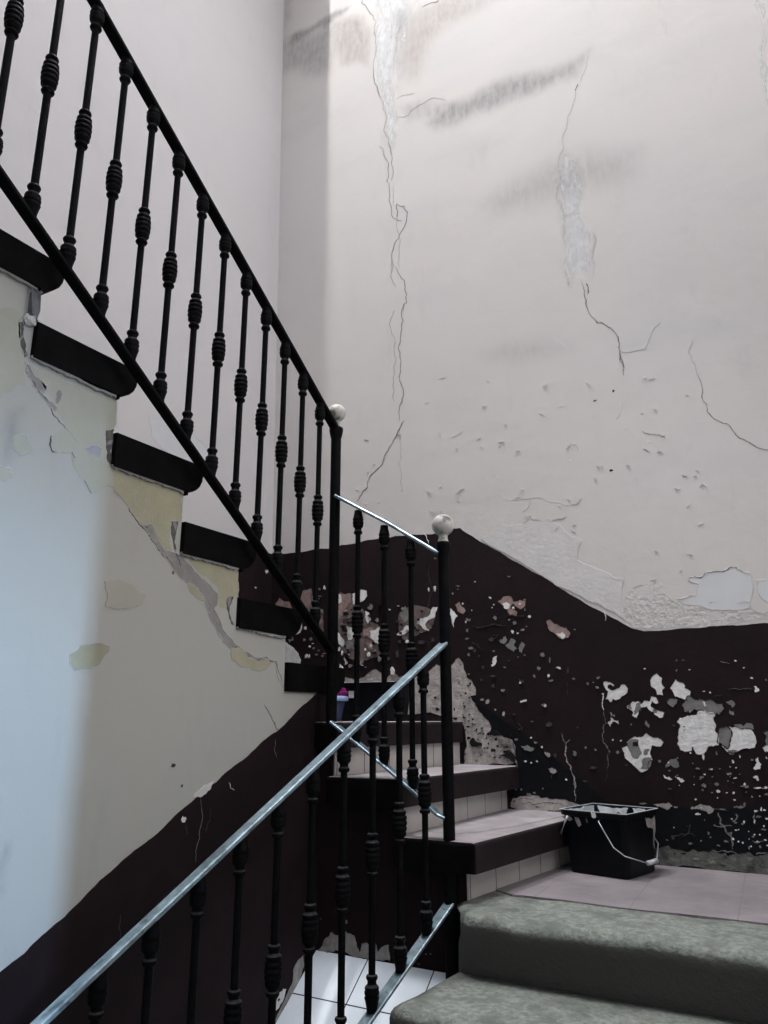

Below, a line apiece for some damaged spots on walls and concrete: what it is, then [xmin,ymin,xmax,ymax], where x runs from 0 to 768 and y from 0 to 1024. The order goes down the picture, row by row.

crack [556,62,587,246]
crack [359,0,444,498]
crack [582,236,658,375]
crack [688,340,766,450]
peeling [0,307,596,785]
peeling [481,474,768,630]
peeling [181,781,213,863]
peeling [510,652,768,875]